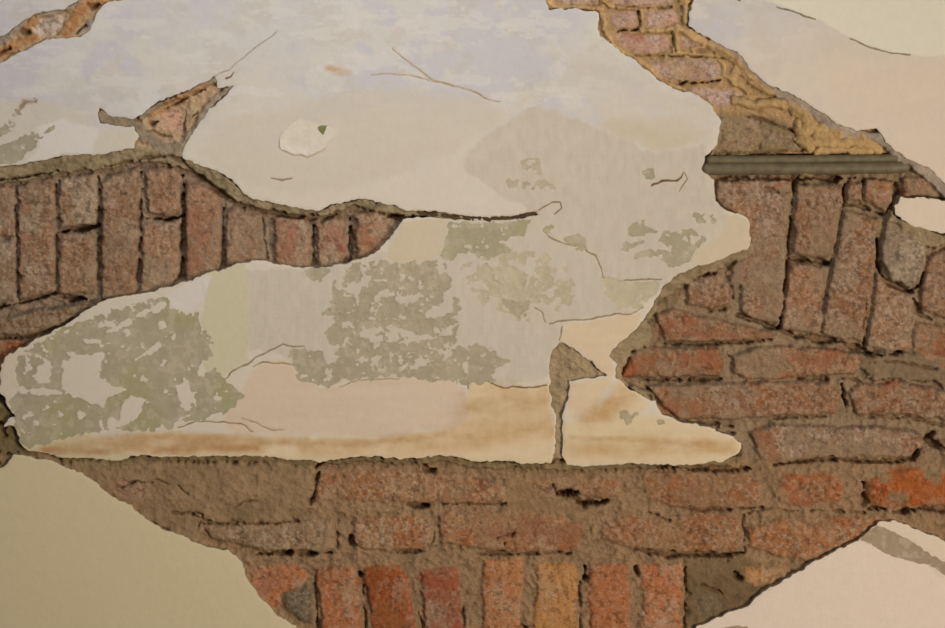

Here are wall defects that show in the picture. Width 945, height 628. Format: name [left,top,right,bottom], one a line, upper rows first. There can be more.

flaking render [0,76,458,372]
peeling [288,260,510,389]
flaking render [0,297,945,628]
peeling [440,218,576,323]
peeling [505,158,555,190]
flaking render [545,0,945,465]